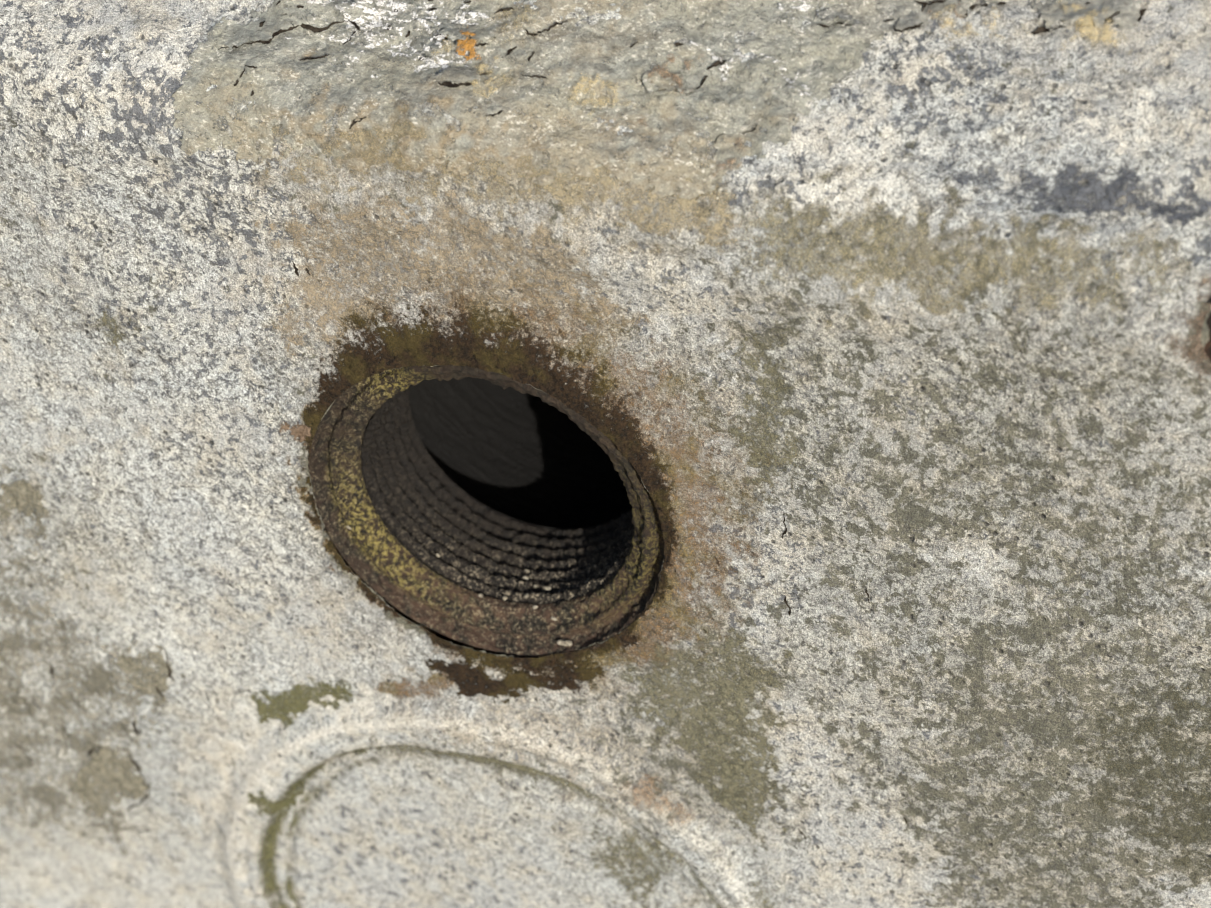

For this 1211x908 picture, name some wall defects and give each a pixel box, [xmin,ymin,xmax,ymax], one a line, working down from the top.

crack [218,20,360,78]
corrosion [443,27,512,97]
peeling [171,0,1001,200]
peeling [1029,0,1143,33]
corrosion [1164,275,1211,379]
corrosion [279,277,763,707]